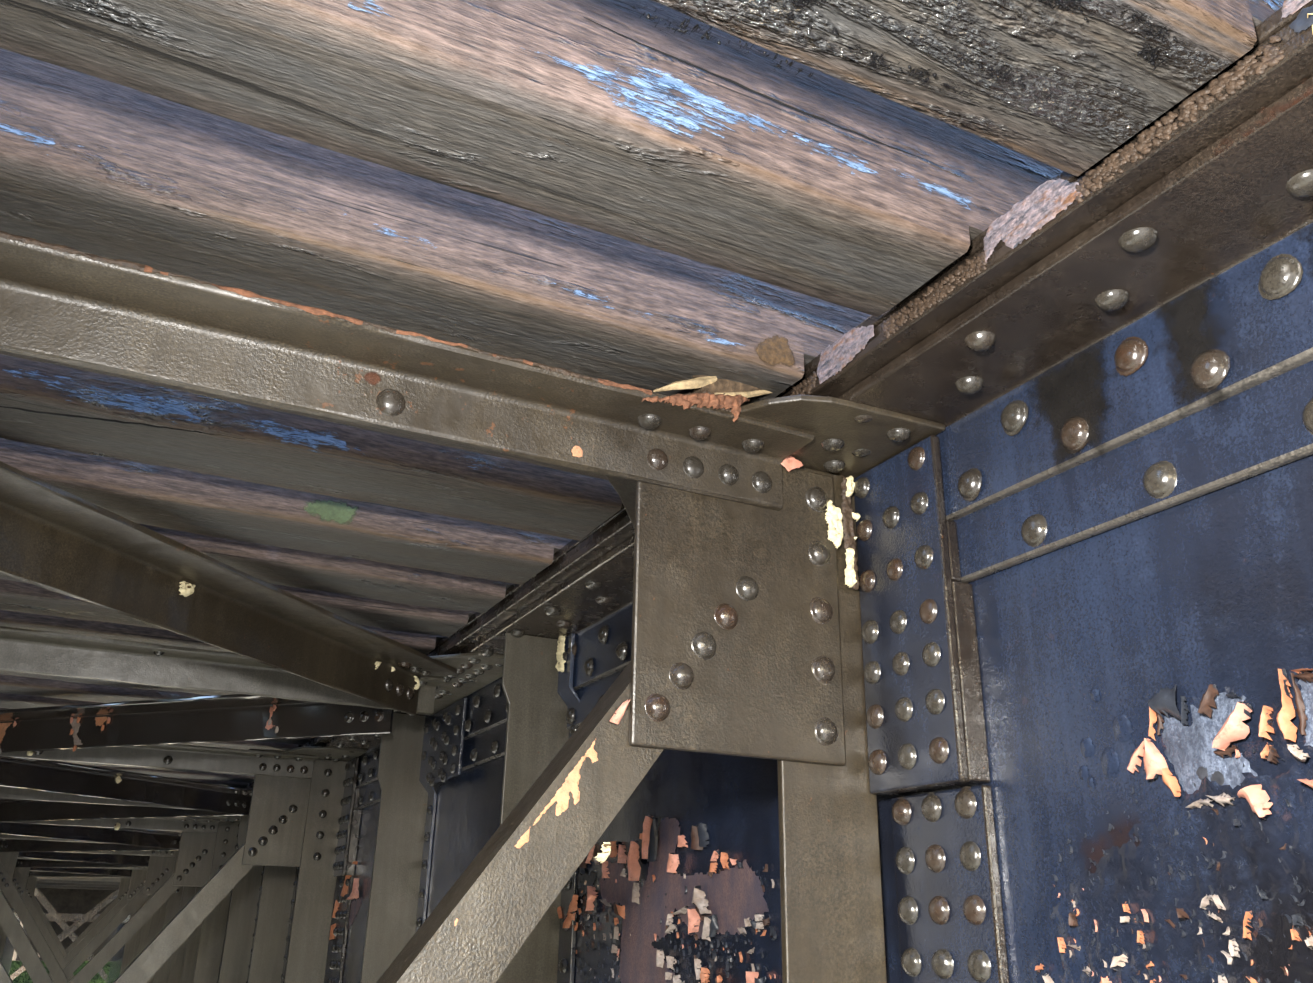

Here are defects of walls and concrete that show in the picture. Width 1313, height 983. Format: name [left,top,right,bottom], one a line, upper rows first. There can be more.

rust [1075,35,1285,203]
rust [0,231,750,422]
peeling [0,721,17,754]
peeling [69,717,111,751]
peeling [515,739,598,848]
peeling [609,699,630,724]
peeling [557,815,777,983]
peeling [1035,668,1313,983]